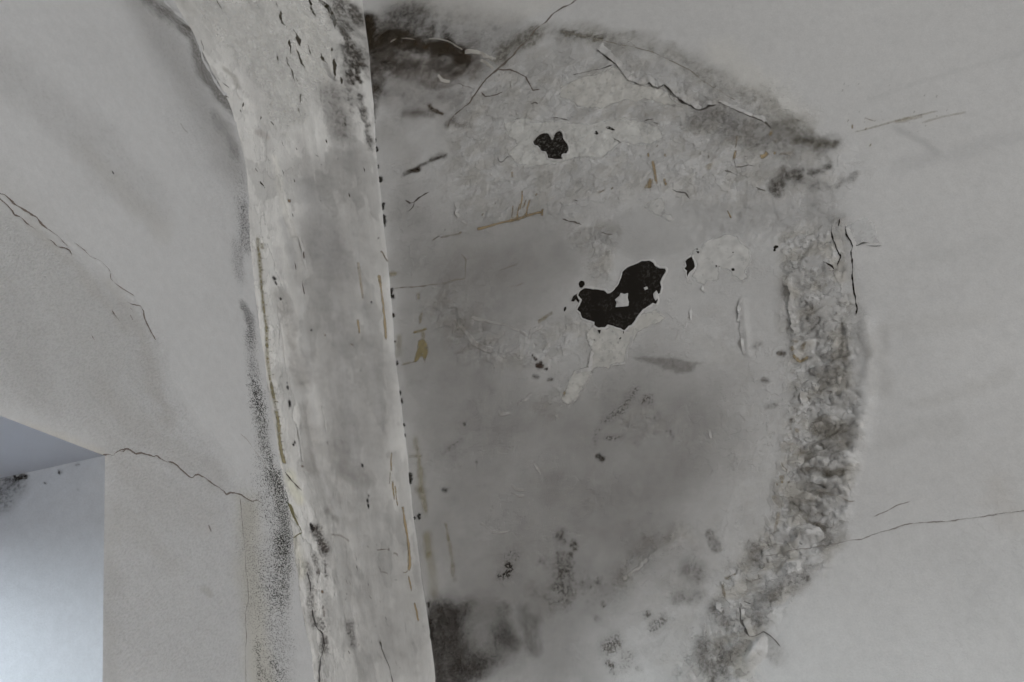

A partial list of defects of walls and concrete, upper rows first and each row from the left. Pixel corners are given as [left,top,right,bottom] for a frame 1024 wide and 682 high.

mould [333,0,477,152]
crack [448,0,771,128]
peeling [505,118,662,166]
mould [769,170,814,195]
crack [0,193,156,340]
peeling [682,235,750,284]
crack [825,219,868,314]
peeling [562,258,668,404]
crack [103,448,302,667]
mould [240,300,293,682]
crack [765,501,1024,556]
mould [427,602,483,682]